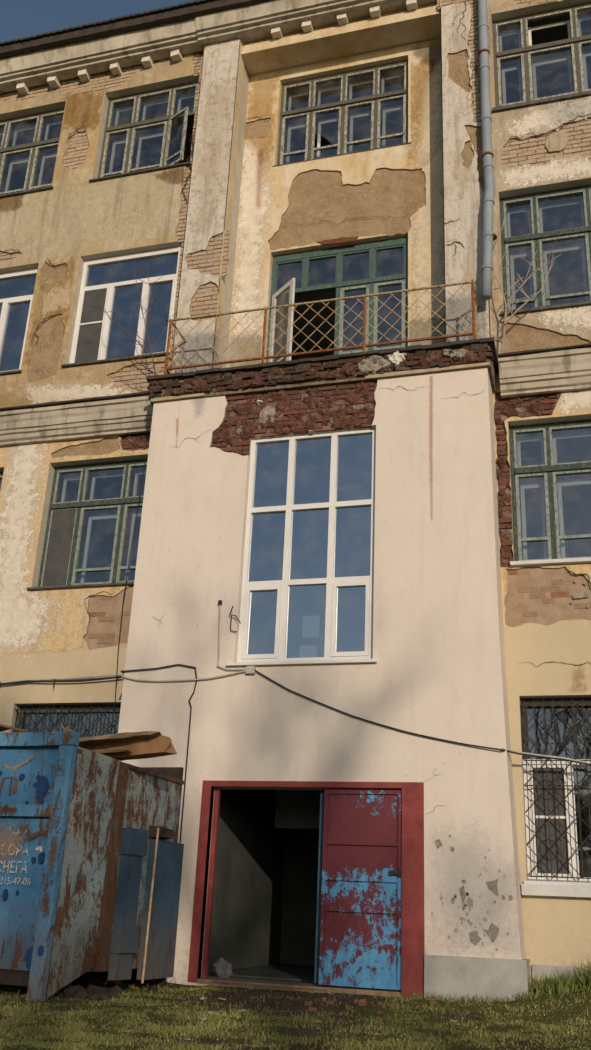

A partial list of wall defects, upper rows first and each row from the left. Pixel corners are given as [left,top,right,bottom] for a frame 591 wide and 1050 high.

flaking render [0,250,22,262]
flaking render [63,130,89,169]
flaking render [172,0,591,344]
flaking render [19,261,591,456]
peeling [0,442,62,664]
flaking render [83,585,134,650]
flaking render [494,389,591,627]